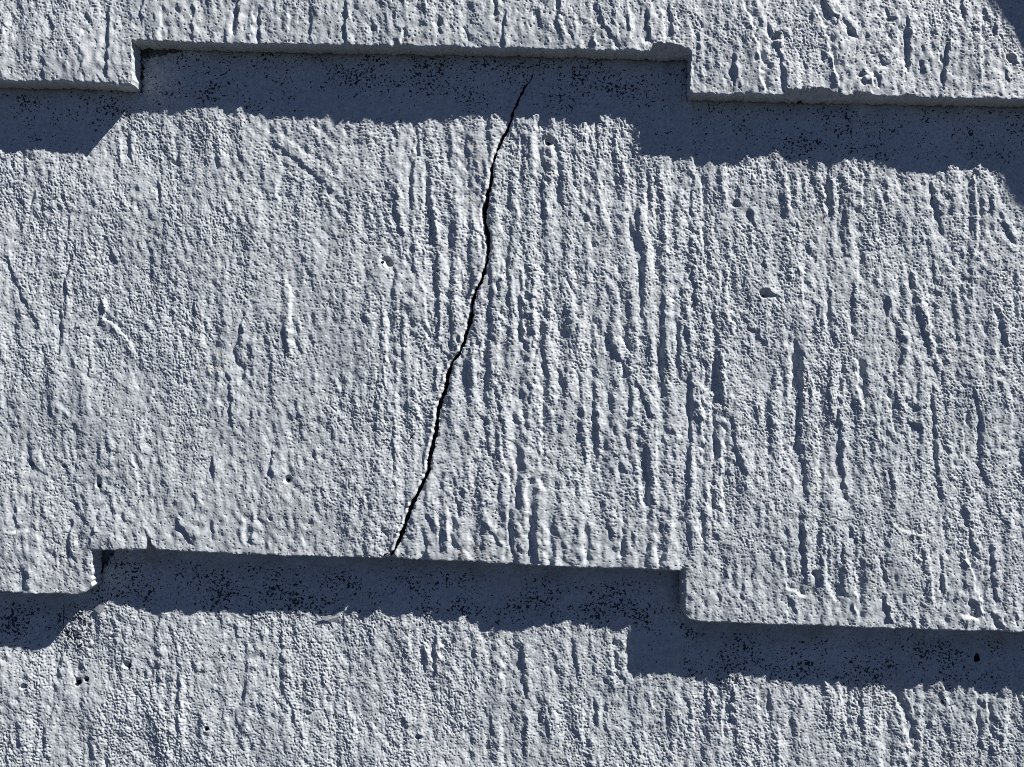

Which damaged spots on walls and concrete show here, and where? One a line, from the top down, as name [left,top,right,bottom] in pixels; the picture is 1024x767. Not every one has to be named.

crack [383,71,534,557]